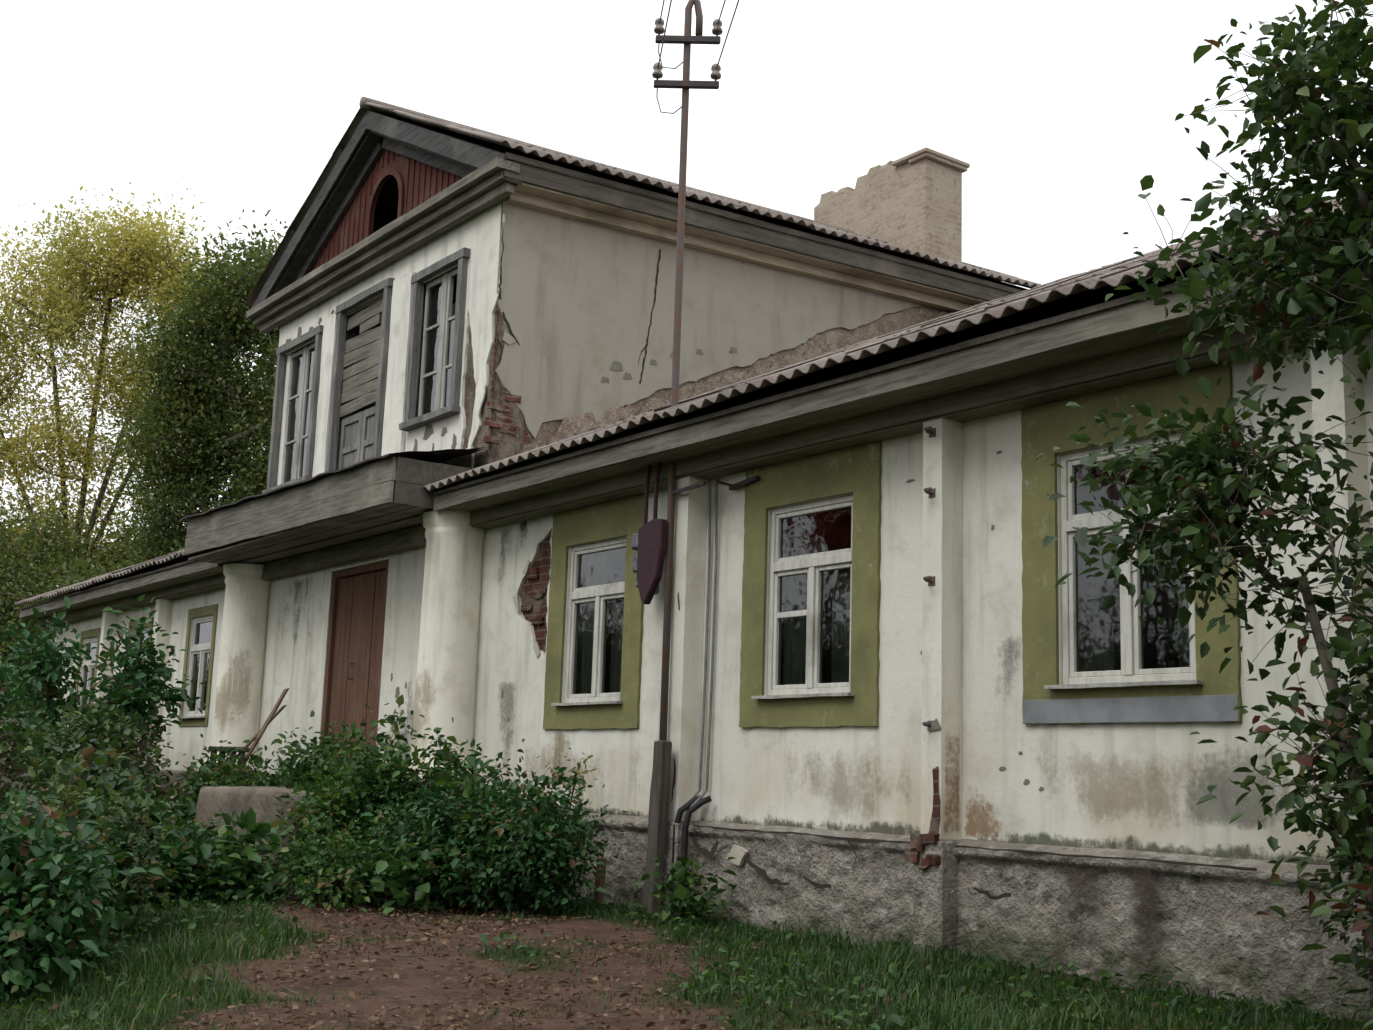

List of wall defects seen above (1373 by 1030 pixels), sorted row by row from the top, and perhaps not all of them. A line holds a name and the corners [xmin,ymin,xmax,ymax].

crack [638,249,661,384]
spalling [473,305,531,469]
spalling [548,311,954,443]
flaking render [513,532,552,658]
water stain [558,806,648,817]
water stain [724,816,919,836]
water stain [978,833,1330,865]
water stain [1187,762,1286,826]
water stain [1128,868,1159,988]